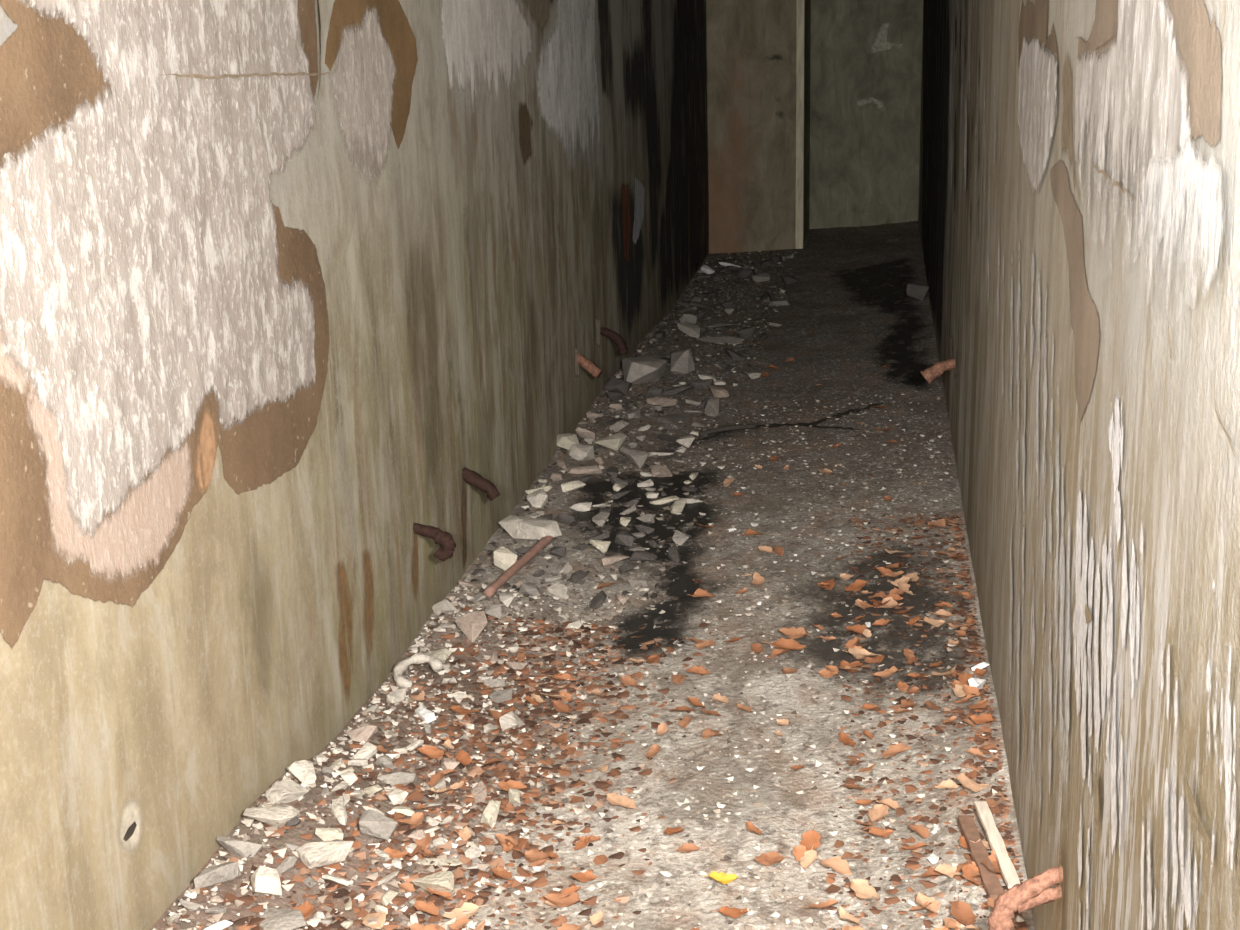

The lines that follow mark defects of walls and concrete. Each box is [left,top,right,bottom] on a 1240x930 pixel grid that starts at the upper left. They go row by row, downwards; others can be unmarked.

peeling [0,0,418,648]
peeling [441,0,601,158]
rust [920,358,955,384]
peeling [1017,0,1223,422]
rust [412,467,500,595]
water stain [988,238,1143,930]
rust [988,866,1063,930]
water stain [1140,645,1236,930]